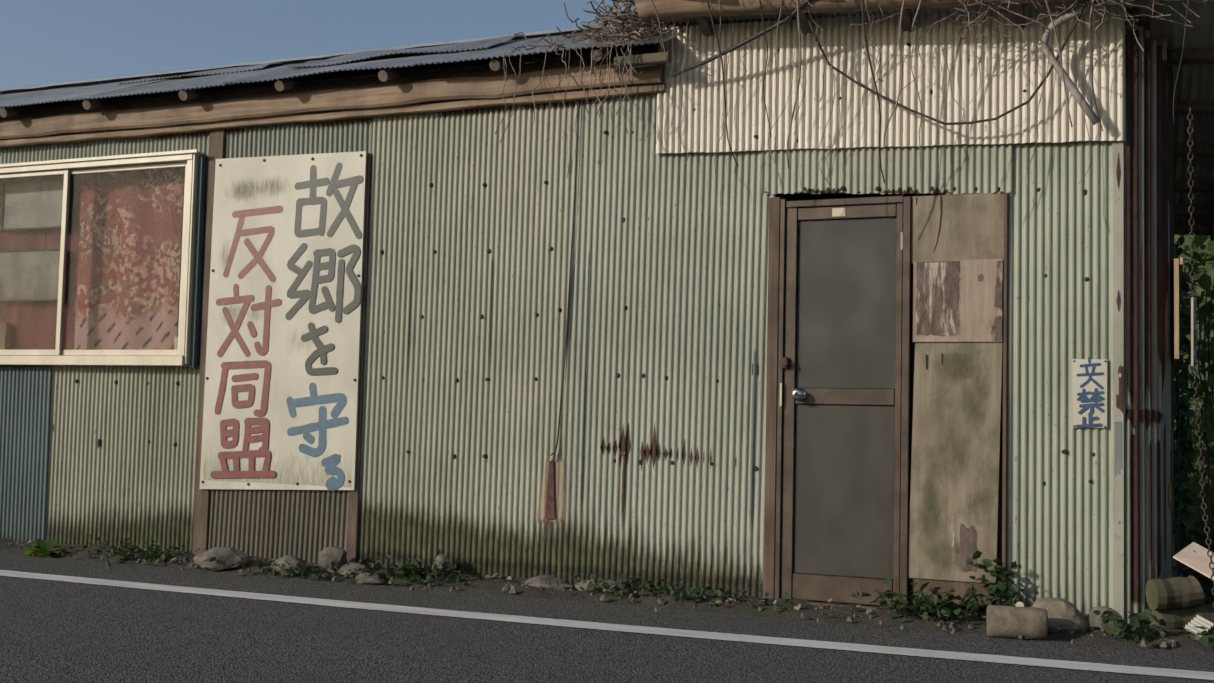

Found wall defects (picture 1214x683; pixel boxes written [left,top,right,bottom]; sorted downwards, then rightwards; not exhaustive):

peeling [915,261,961,336]
peeling [978,261,1002,341]
rust [1116,29,1175,603]
rust [600,423,711,515]
leakage [447,557,762,598]